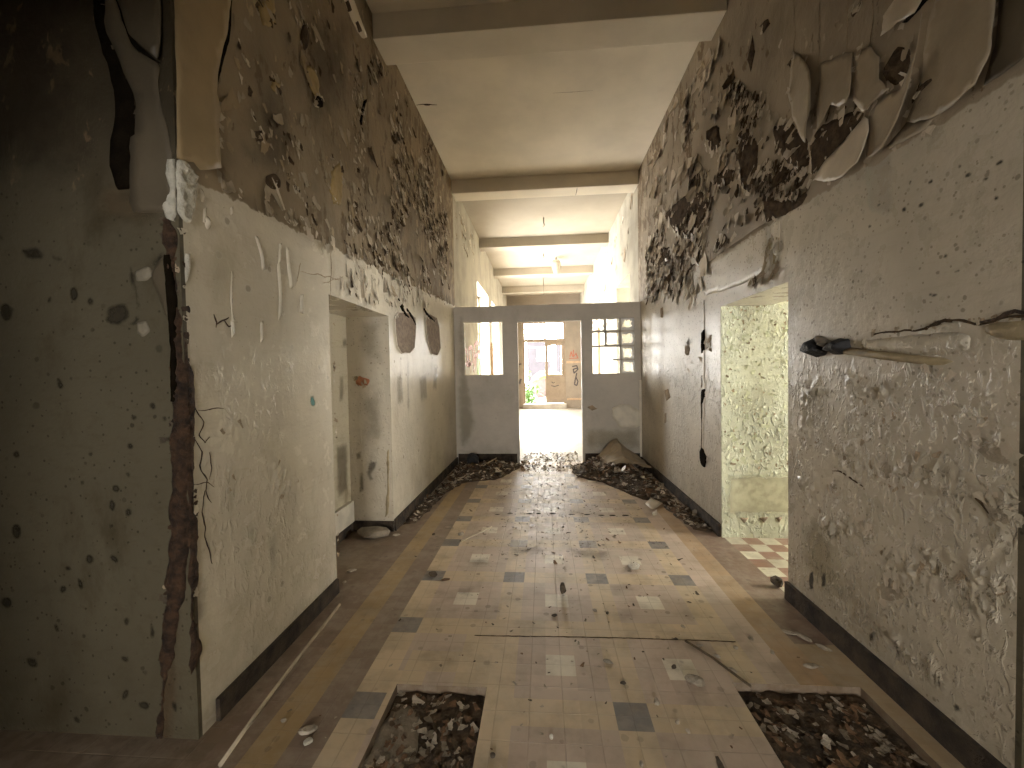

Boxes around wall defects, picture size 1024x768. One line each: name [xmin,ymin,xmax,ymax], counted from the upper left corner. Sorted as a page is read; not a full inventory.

peeling [599,0,1024,318]
peeling [104,0,475,739]
crack [699,300,709,467]
crack [871,309,1024,337]
crack [194,407,224,564]